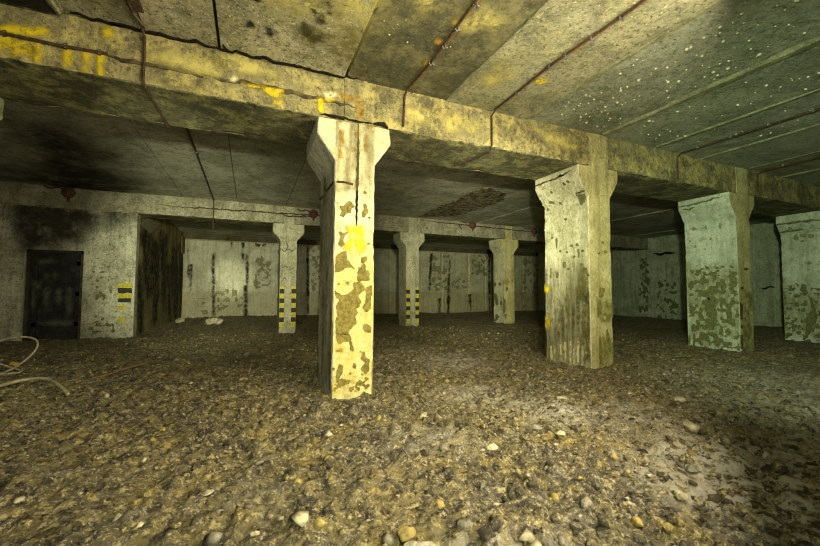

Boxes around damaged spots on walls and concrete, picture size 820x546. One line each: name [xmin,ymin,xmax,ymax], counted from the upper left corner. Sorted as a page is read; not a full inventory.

damp [149,51,277,81]
crack [70,11,357,79]
damp [279,0,374,66]
crack [108,54,372,226]
peeling [340,201,371,219]
spalling [418,187,506,217]
peeling [332,231,373,392]
peeling [688,265,748,351]
peeling [784,283,820,342]